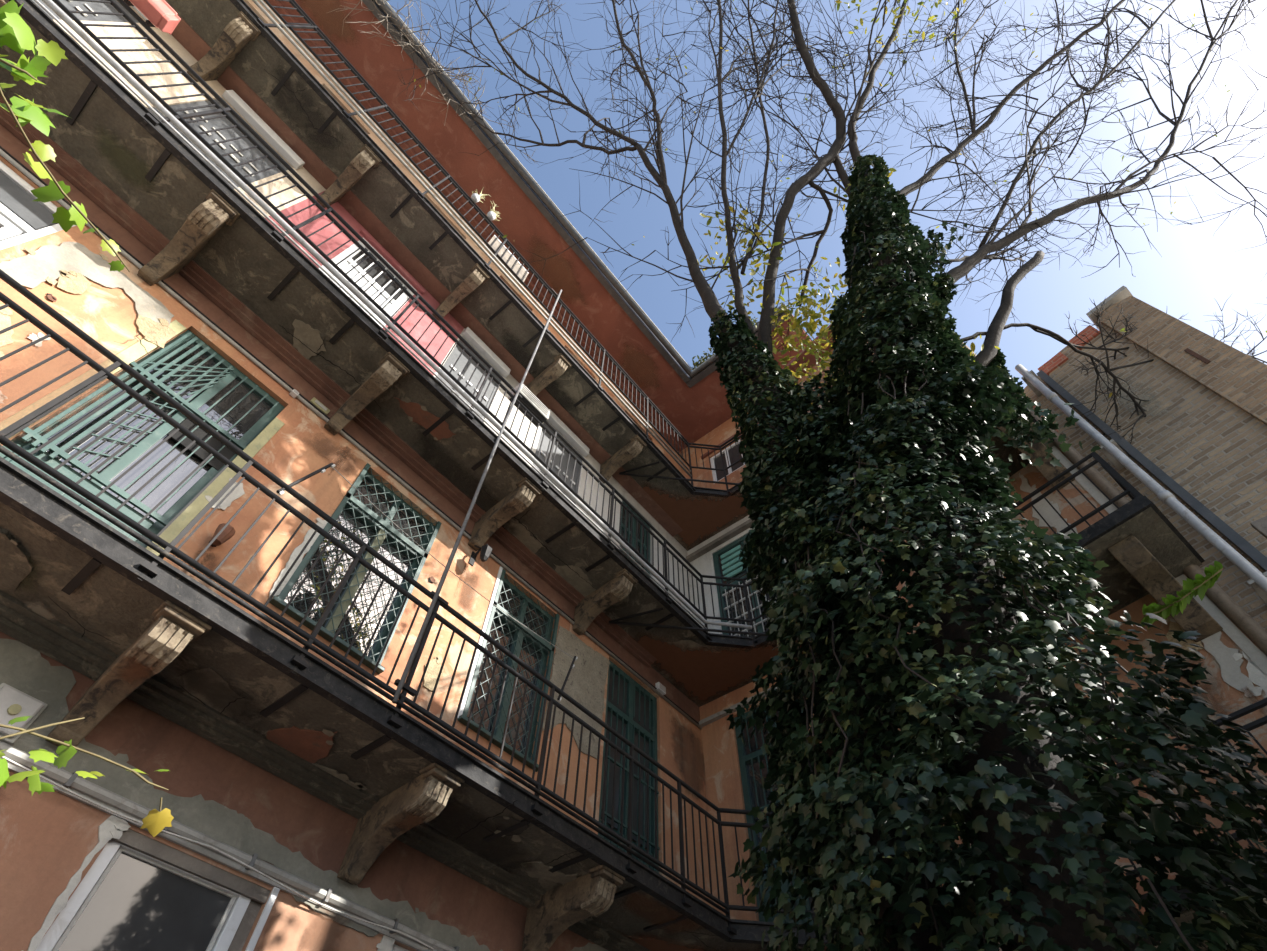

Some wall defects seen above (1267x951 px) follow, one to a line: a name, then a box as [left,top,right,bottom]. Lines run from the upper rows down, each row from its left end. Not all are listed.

peeling [47,270,92,302]
peeling [0,304,51,357]
peeling [1165,618,1267,698]
peeling [266,726,367,790]
peeling [292,894,383,949]